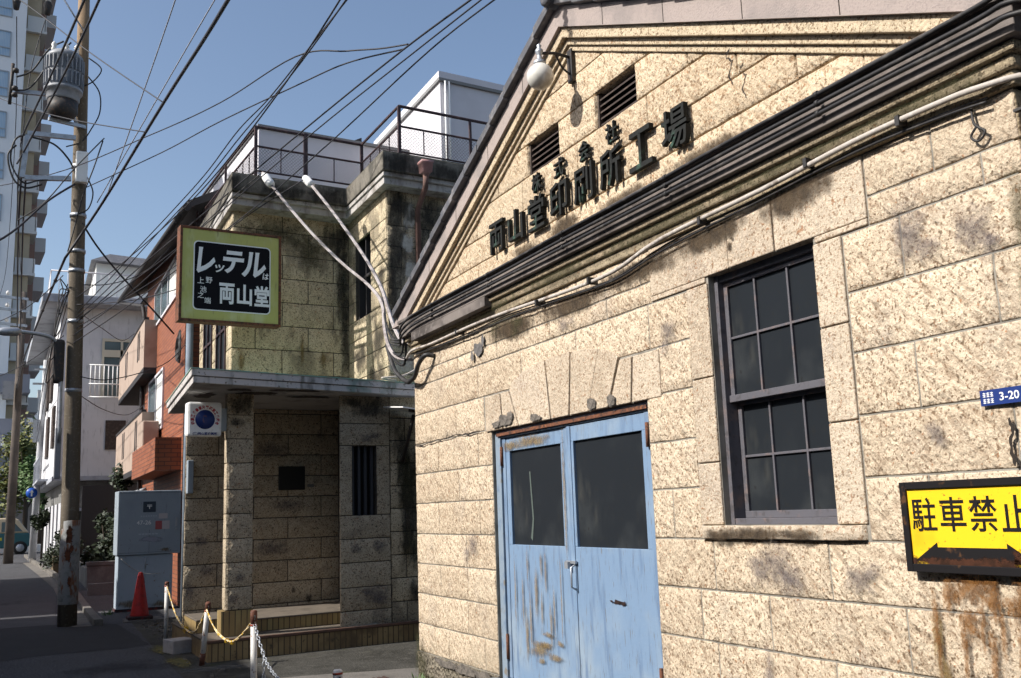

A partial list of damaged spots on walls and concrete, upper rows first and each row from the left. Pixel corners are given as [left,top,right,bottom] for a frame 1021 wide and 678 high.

leakage [268,185,338,208]
leakage [323,226,414,380]
leakage [379,193,442,320]
leakage [394,424,418,553]
crack [1008,417,1016,466]
rust [65,525,74,562]
rust [514,557,563,663]
rust [932,573,1021,678]